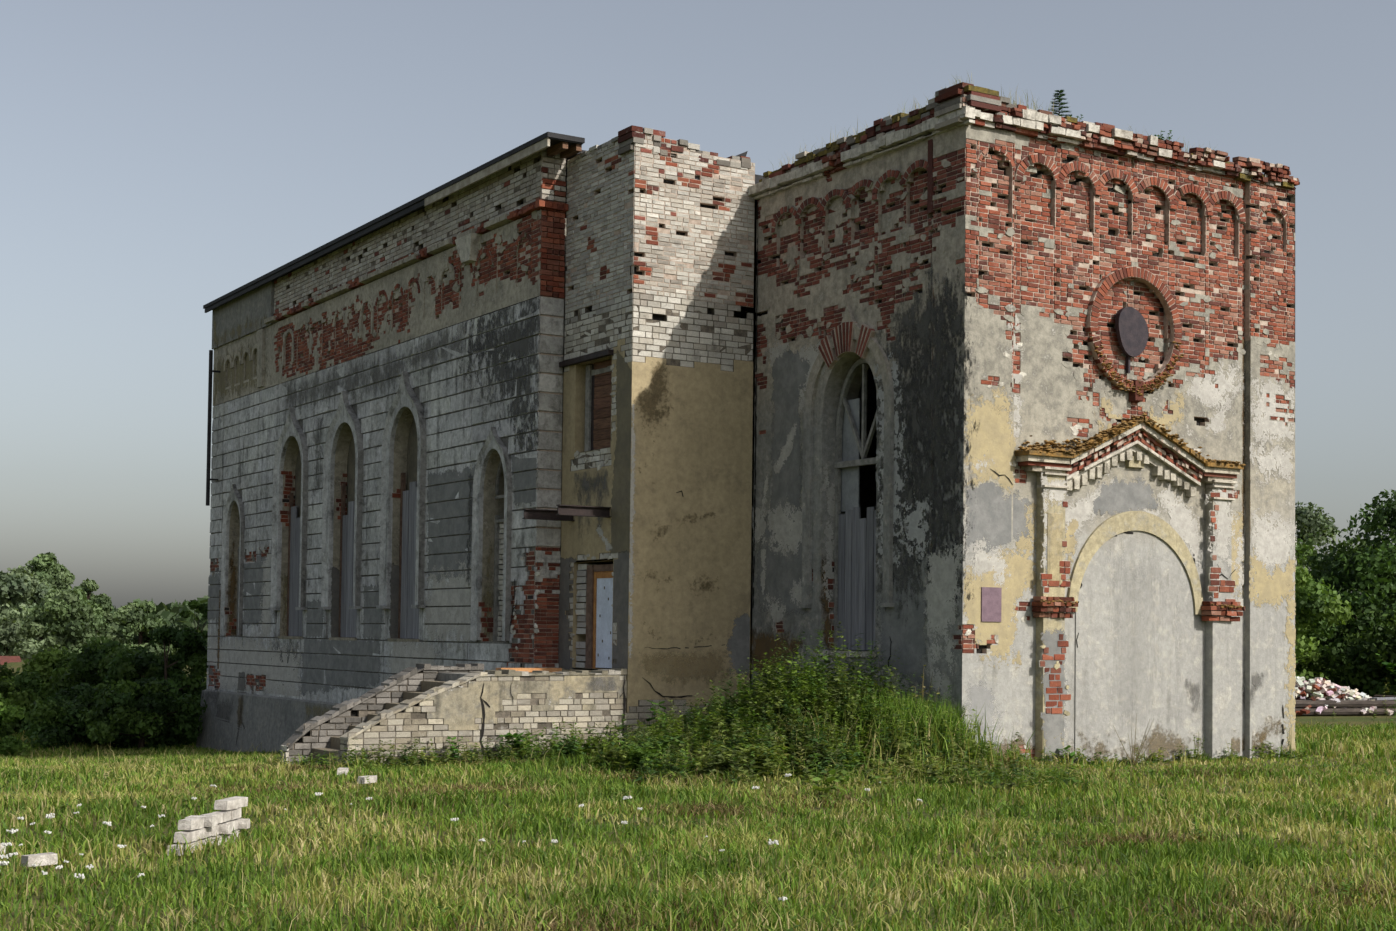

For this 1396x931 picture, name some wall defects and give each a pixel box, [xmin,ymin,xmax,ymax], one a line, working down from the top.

spalling [274,210,542,384]
peeling [207,540,324,697]
spalling [280,471,295,527]
water stain [286,297,541,489]
peeling [363,353,705,749]
water stain [638,362,673,422]
water stain [875,262,980,619]
spalling [712,125,1297,764]
crack [480,681,513,752]